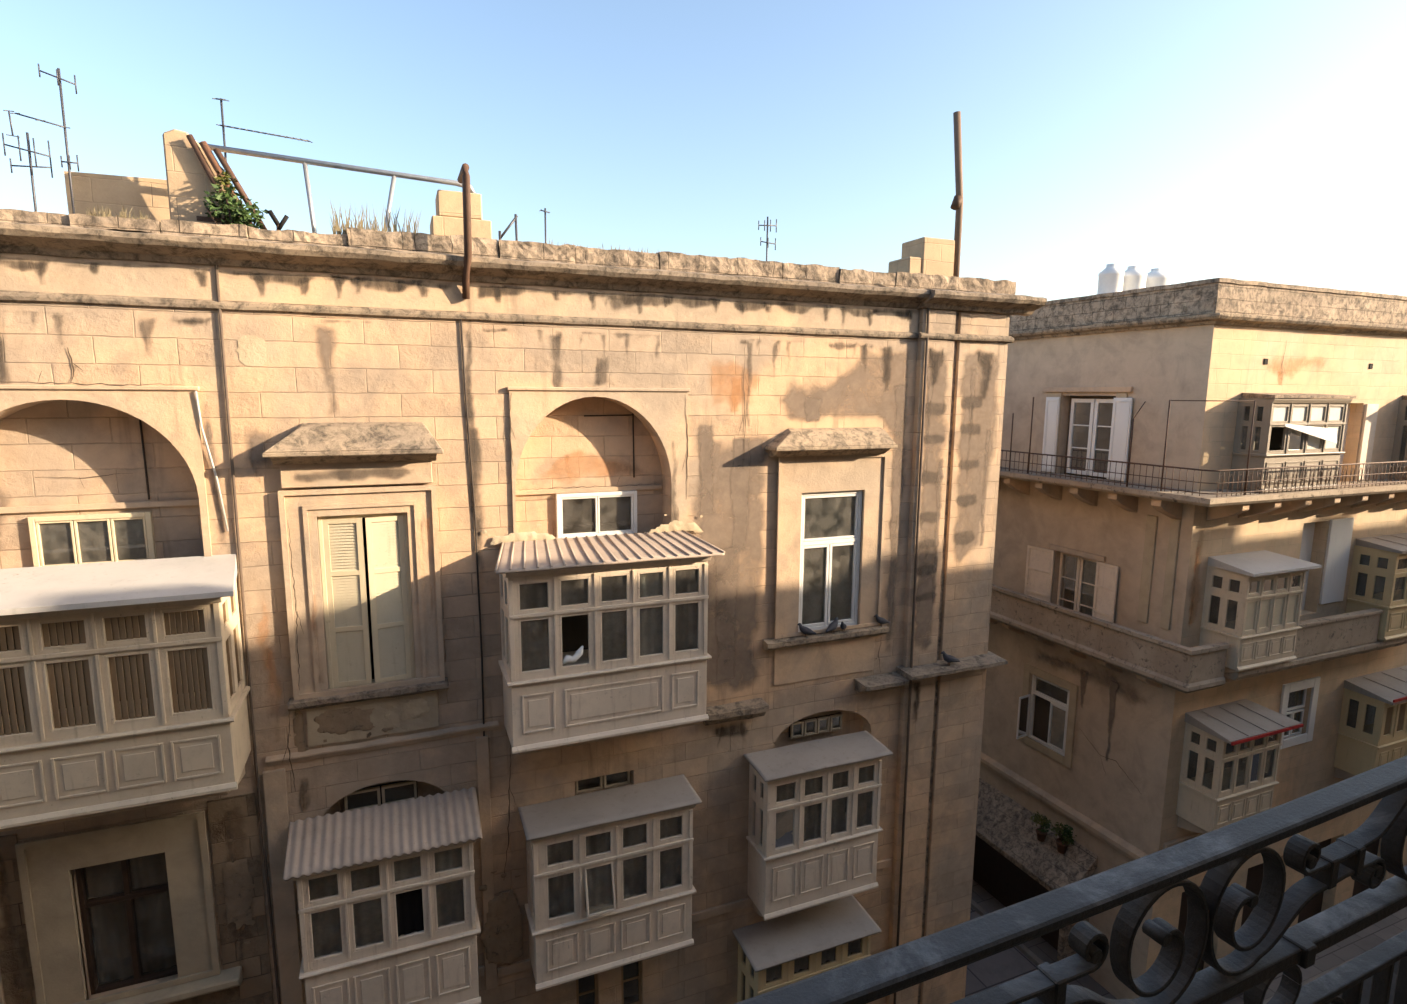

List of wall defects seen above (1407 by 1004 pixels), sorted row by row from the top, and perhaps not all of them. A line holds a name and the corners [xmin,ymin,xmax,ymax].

water stain [1,260,45,276]
water stain [238,274,308,292]
water stain [332,276,447,294]
crack [0,347,181,386]
water stain [317,328,334,374]
crack [35,473,128,489]
water stain [783,344,907,637]
water stain [915,349,998,649]
water stain [696,426,767,689]